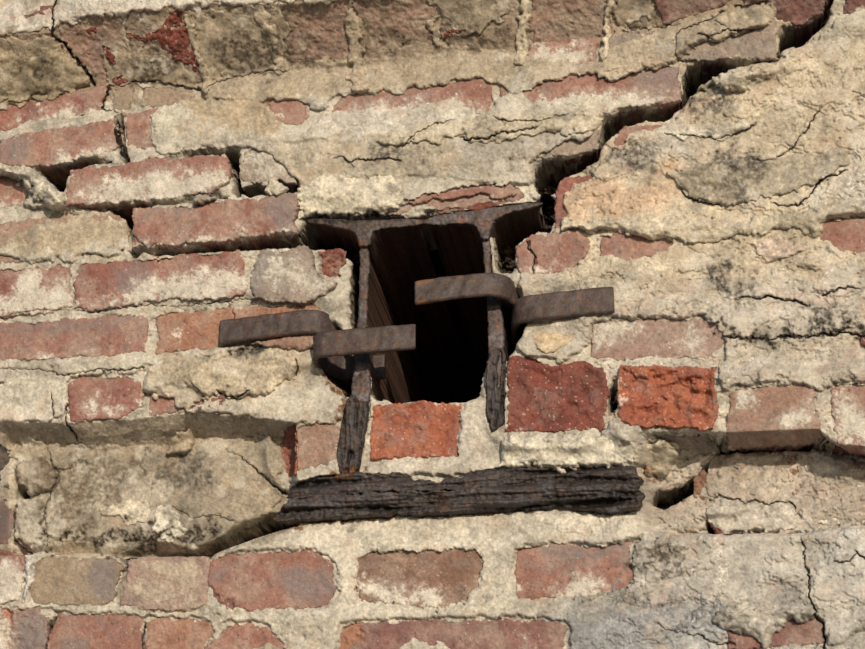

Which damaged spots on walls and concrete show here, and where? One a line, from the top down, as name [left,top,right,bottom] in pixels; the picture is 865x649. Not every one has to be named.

spalling [126,10,199,72]
peeling [675,2,777,58]
crack [51,0,130,162]
crack [337,114,567,166]
peeling [666,147,851,211]
crack [779,170,846,206]
peeling [574,199,865,263]
rust [323,374,352,420]
spalling [0,444,10,481]
peeling [99,498,187,544]
crack [657,492,798,514]
crack [801,541,826,649]